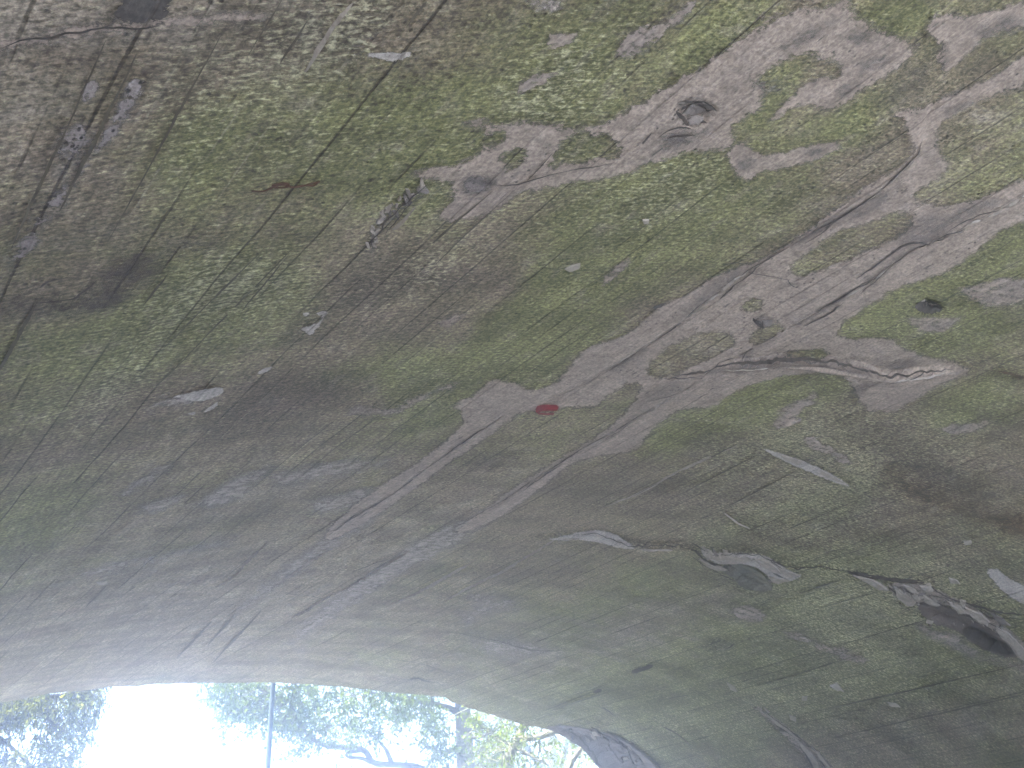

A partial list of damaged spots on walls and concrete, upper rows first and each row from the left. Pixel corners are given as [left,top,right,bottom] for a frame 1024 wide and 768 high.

damp [112,0,172,25]
peeling [924,1,1024,72]
peeling [365,0,918,250]
damp [302,311,328,335]
peeling [324,56,1024,540]
crack [559,139,923,396]
crack [802,195,1024,326]
damp [160,387,224,415]
crack [455,335,952,528]
spalling [693,546,801,592]
spalling [848,568,1024,661]
spalling [547,725,661,768]